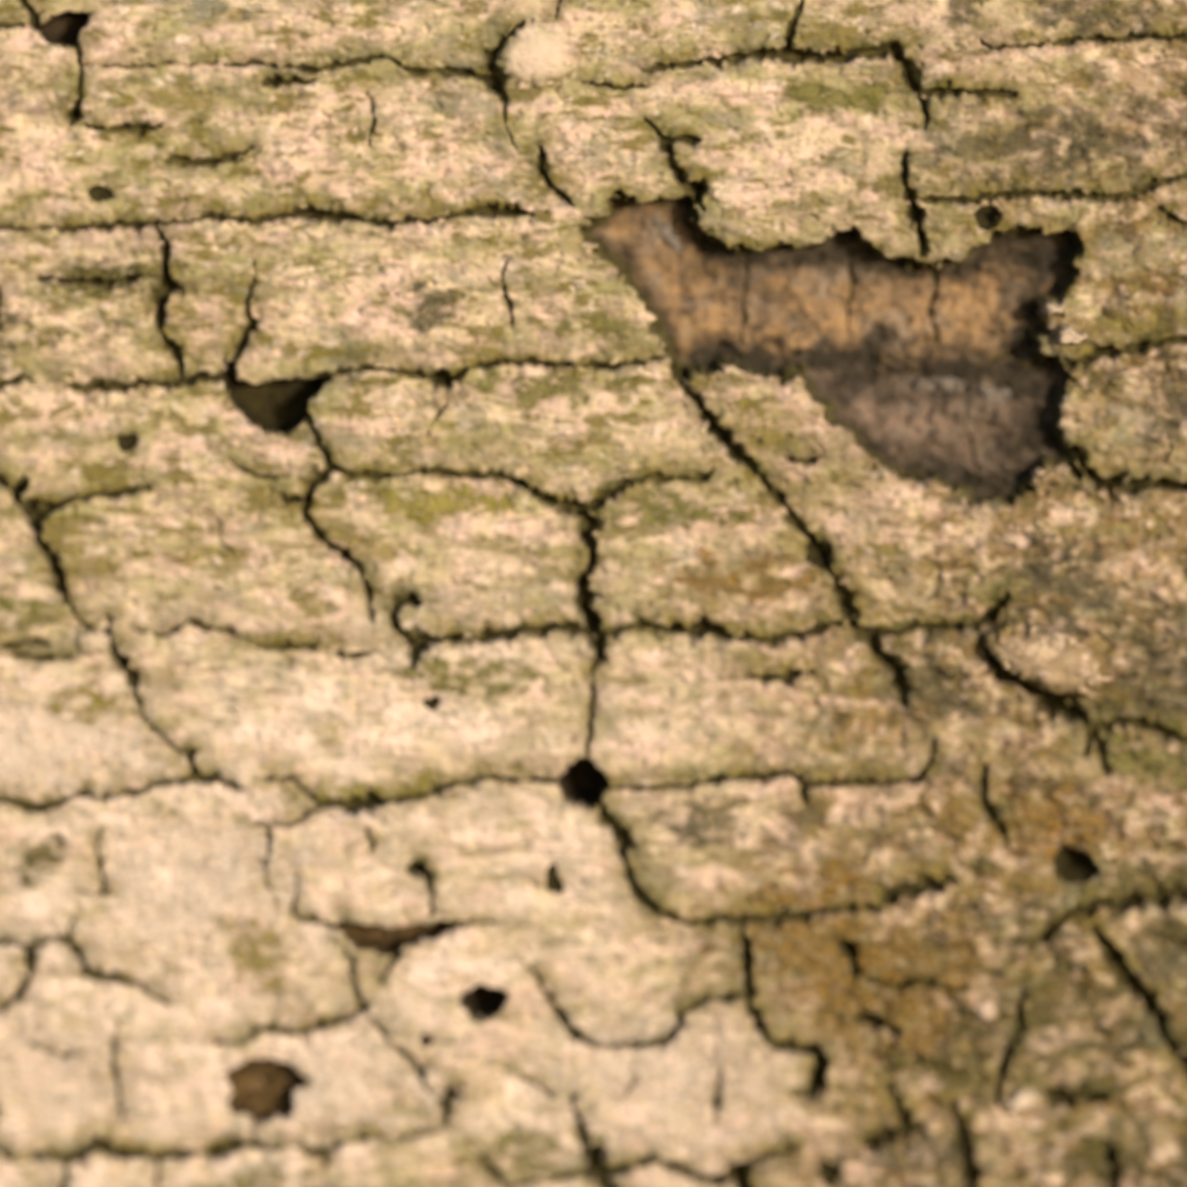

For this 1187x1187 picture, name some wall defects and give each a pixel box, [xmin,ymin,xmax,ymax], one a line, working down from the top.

crack [0,204,534,395]
crack [67,21,574,207]
crack [644,117,707,204]
crack [581,0,1017,130]
spalling [581,188,1088,507]
crack [900,152,1187,257]
crack [980,32,1187,50]
crack [226,354,1187,777]
crack [0,475,557,1187]
crack [519,738,970,1100]
crack [1000,884,1187,1078]
crack [474,1071,797,1187]